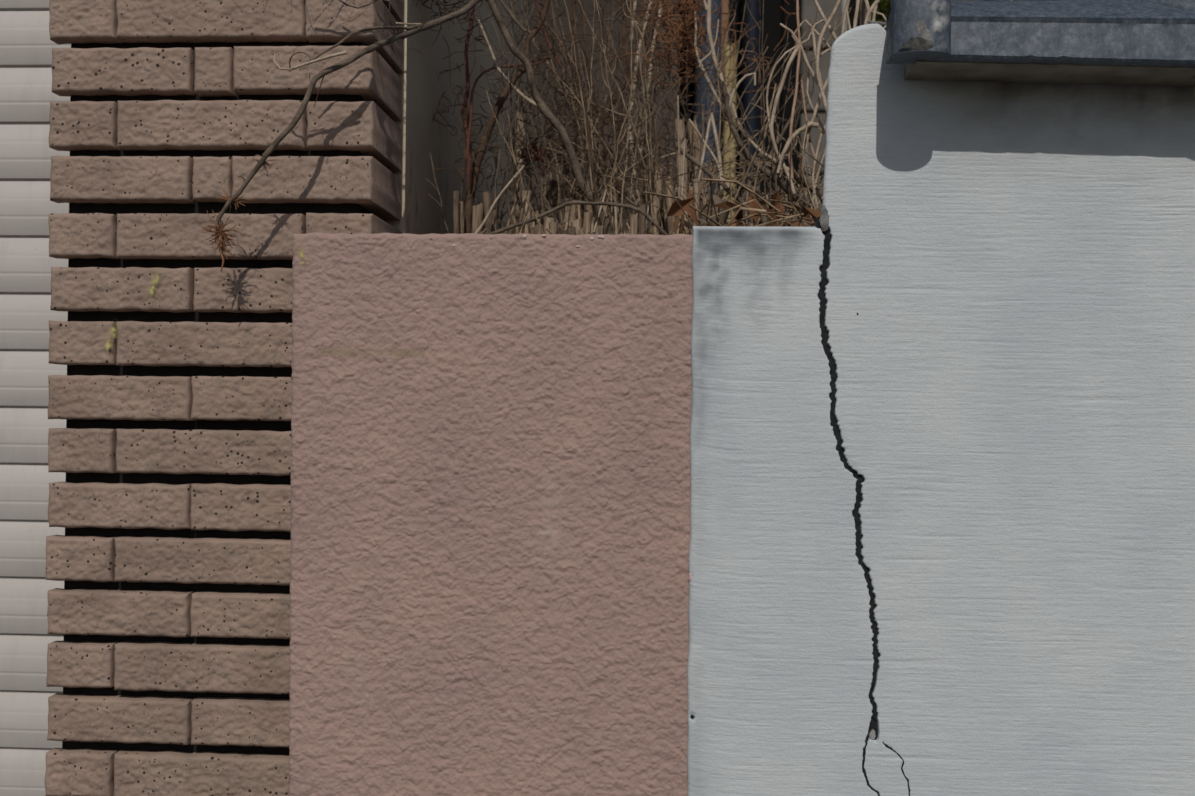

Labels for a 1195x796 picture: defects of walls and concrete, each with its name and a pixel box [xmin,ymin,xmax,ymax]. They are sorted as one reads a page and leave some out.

crack [814,216,910,796]